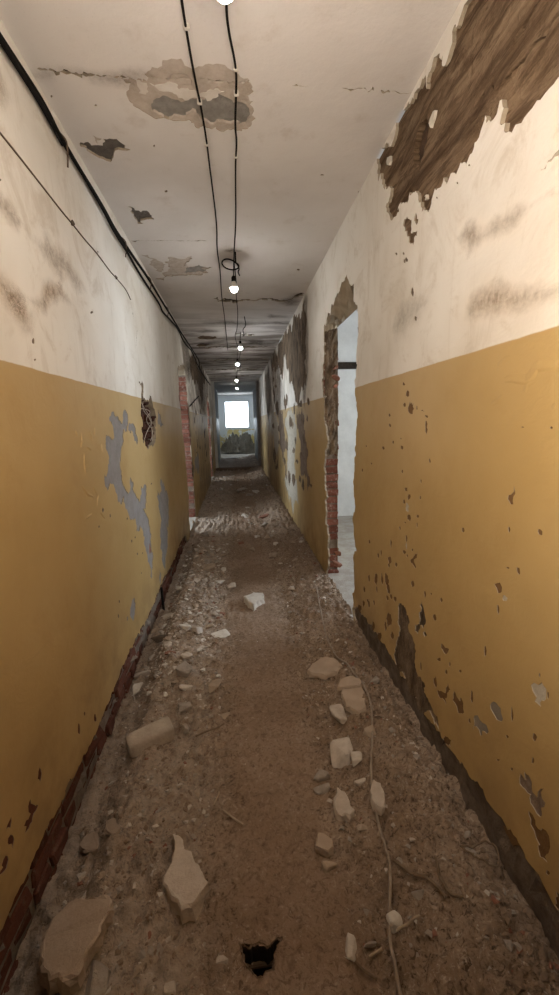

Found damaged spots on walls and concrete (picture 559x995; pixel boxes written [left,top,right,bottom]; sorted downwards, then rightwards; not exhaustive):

spalling [80,136,125,159]
spalling [124,59,255,131]
flaking render [380,0,559,243]
spalling [131,207,152,222]
spalling [143,255,209,280]
flaking render [0,400,186,995]
flaking render [355,541,559,960]